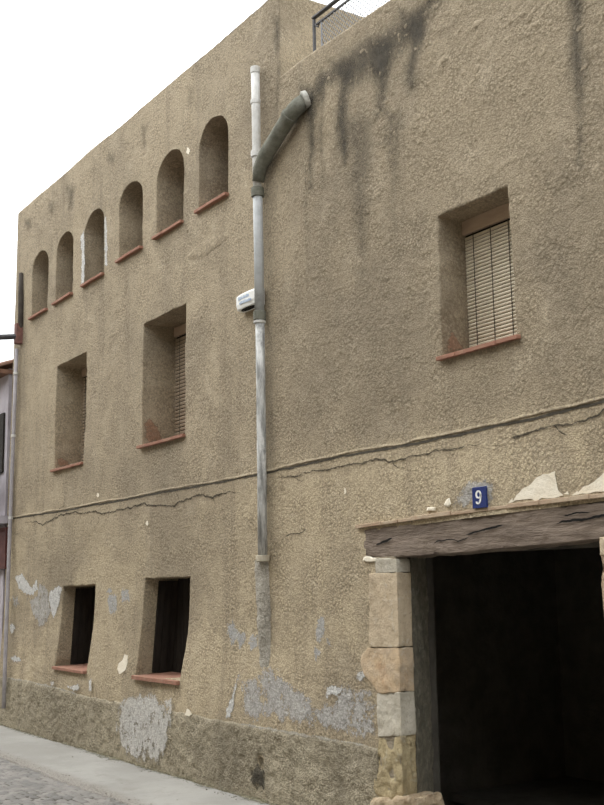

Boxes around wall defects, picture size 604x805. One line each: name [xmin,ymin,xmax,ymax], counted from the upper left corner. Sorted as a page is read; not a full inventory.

crack [509,408,604,439]
crack [275,443,481,482]
spalling [509,471,604,503]
crack [25,491,238,526]
peeling [15,574,38,595]
peeling [49,586,62,618]
peeling [326,685,342,698]